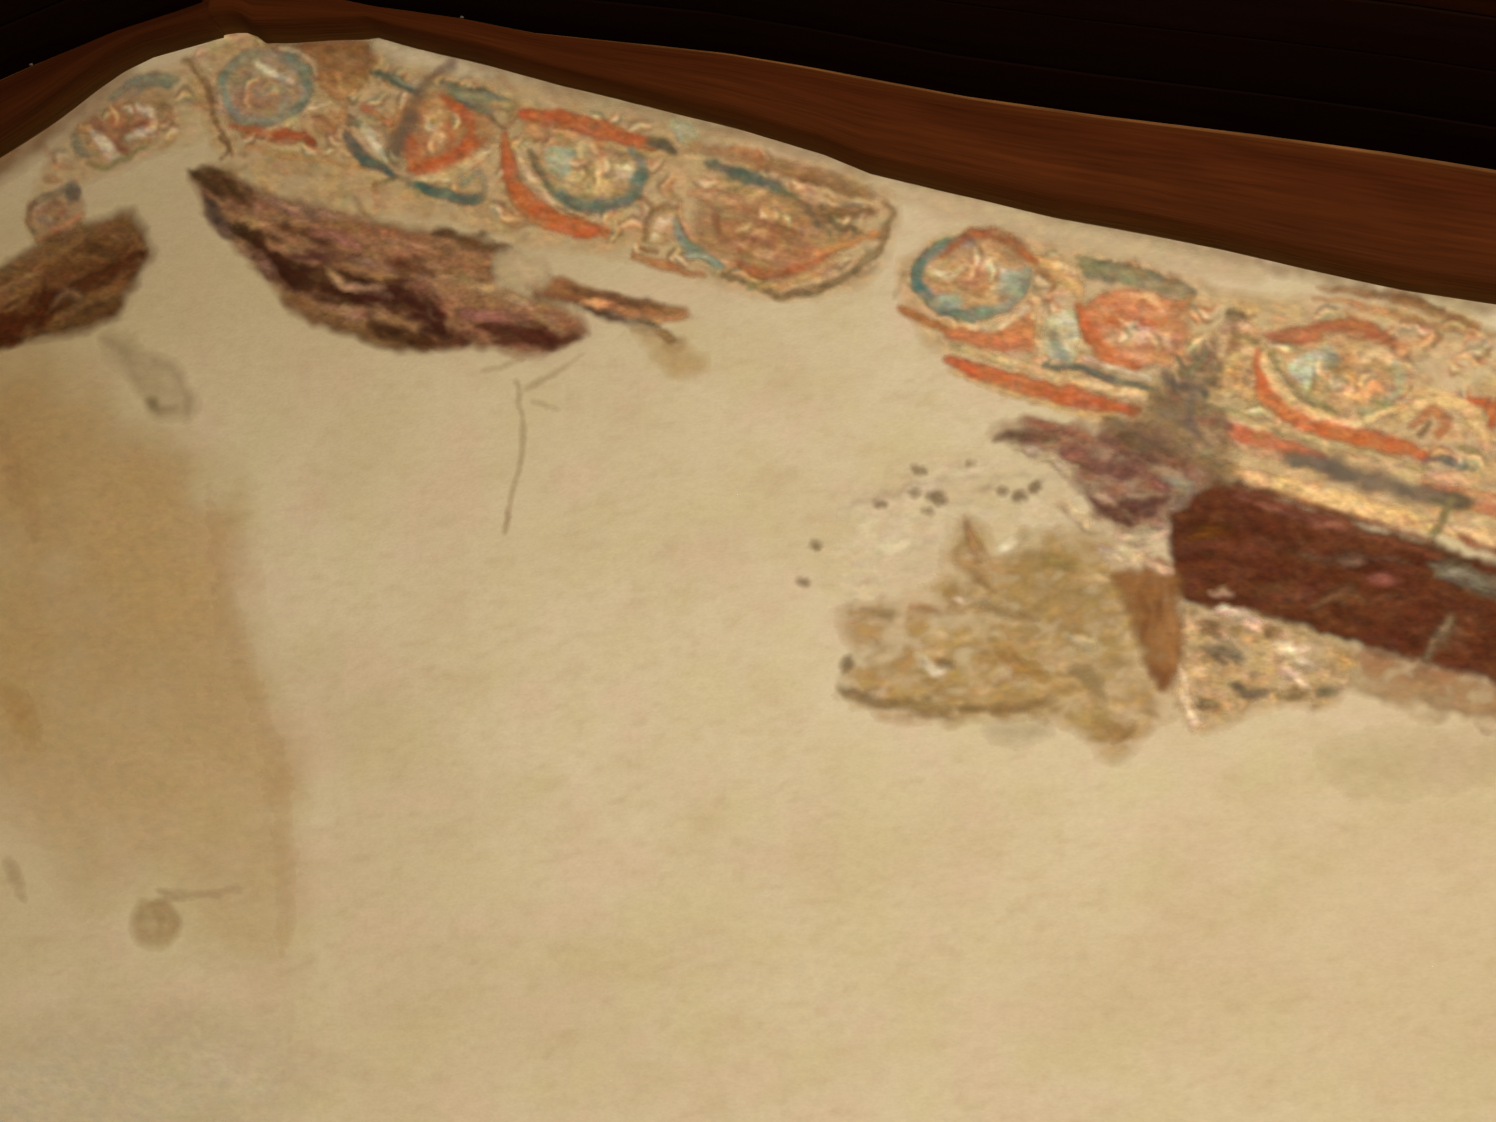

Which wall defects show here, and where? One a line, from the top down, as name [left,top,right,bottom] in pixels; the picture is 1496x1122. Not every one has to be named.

spalling [0,214,148,347]
spalling [190,168,685,353]
leakage [0,395,215,657]
spalling [839,418,1496,727]